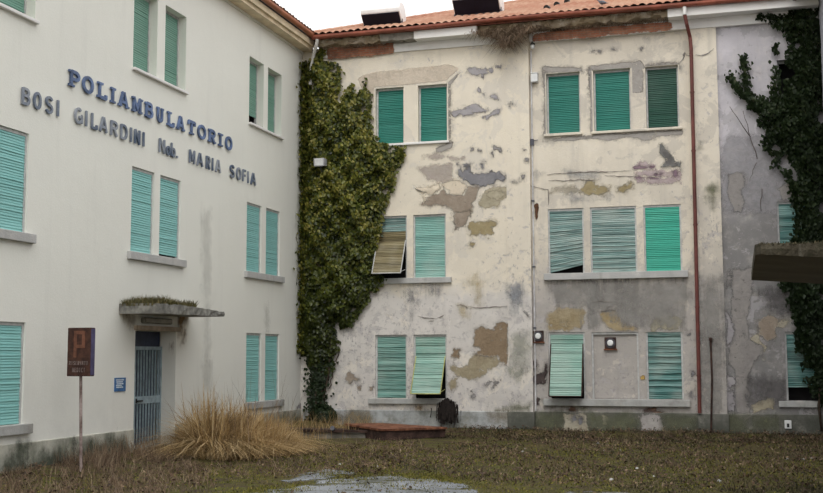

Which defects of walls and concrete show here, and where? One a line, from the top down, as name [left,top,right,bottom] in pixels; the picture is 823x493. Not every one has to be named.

peeling [451,65,513,120]
flaking render [421,145,525,247]
peeling [580,143,682,196]
flaking render [449,322,508,390]
flaking render [546,307,586,332]
flaking render [724,267,775,414]
flaking render [562,407,589,431]
flaking render [638,407,664,431]